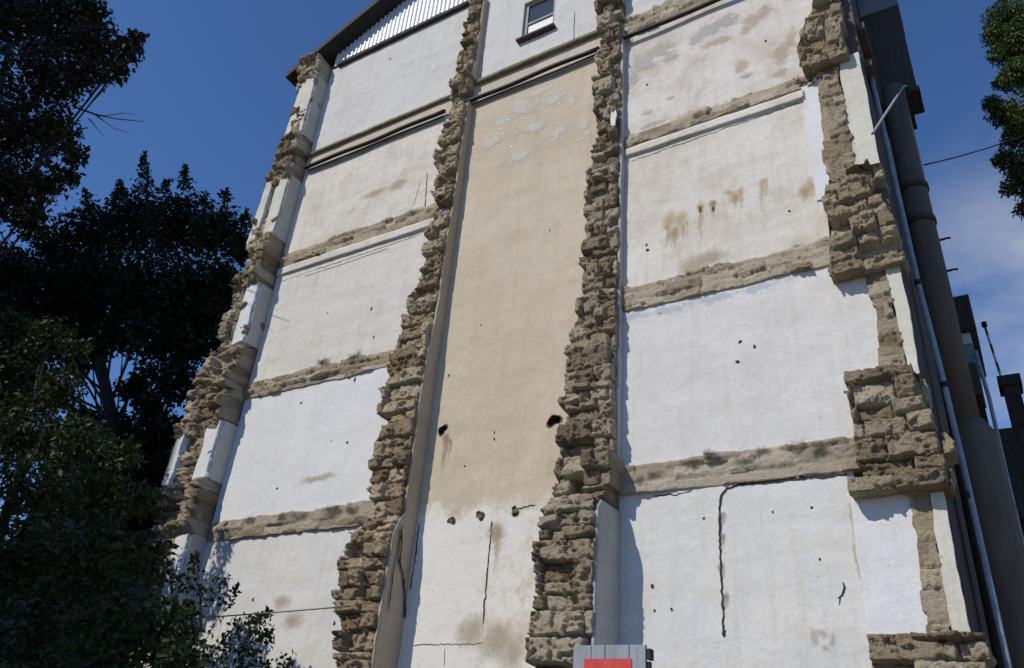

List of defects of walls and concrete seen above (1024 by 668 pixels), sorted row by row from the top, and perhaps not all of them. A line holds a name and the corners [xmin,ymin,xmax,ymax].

peeling [481,88,589,166]
hole [546,415,563,428]
crack [388,524,420,618]
crack [413,521,492,663]
crack [718,473,847,638]